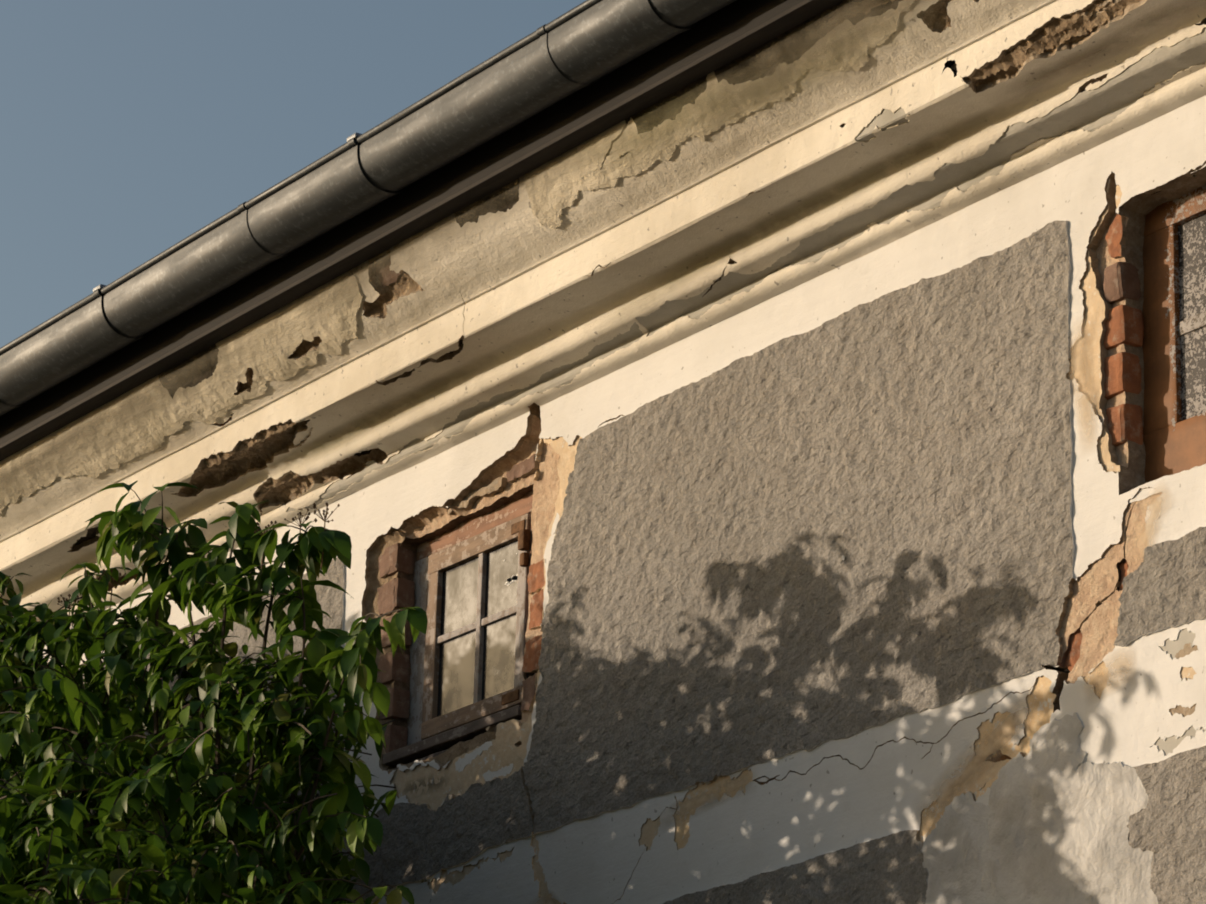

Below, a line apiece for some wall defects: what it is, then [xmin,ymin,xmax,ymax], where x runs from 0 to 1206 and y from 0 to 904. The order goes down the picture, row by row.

spalling [67,527,99,552]
spalling [96,574,141,592]
peeling [0,256,424,514]
peeling [172,0,1206,843]
crack [753,502,1136,785]
peeling [611,769,753,904]